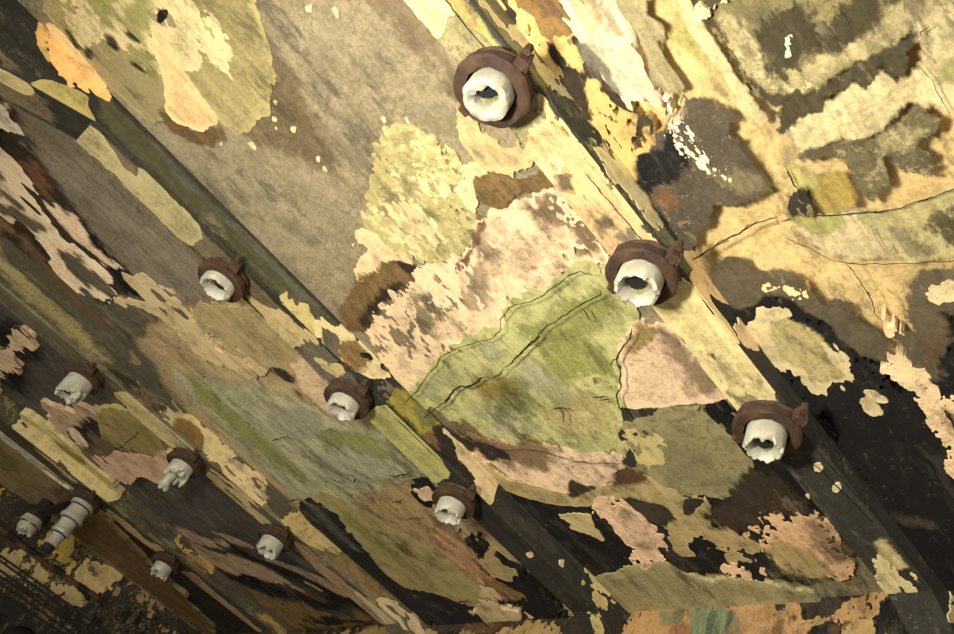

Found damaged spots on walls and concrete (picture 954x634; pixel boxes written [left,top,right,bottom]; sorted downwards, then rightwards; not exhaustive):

flaking render [0,0,670,634]
crack [394,271,620,464]
crack [592,329,632,416]
peeling [443,248,856,588]
crack [692,168,954,321]
peeling [860,389,888,417]
flaking render [880,307,954,479]
peeling [925,267,954,306]
peeling [621,538,918,634]